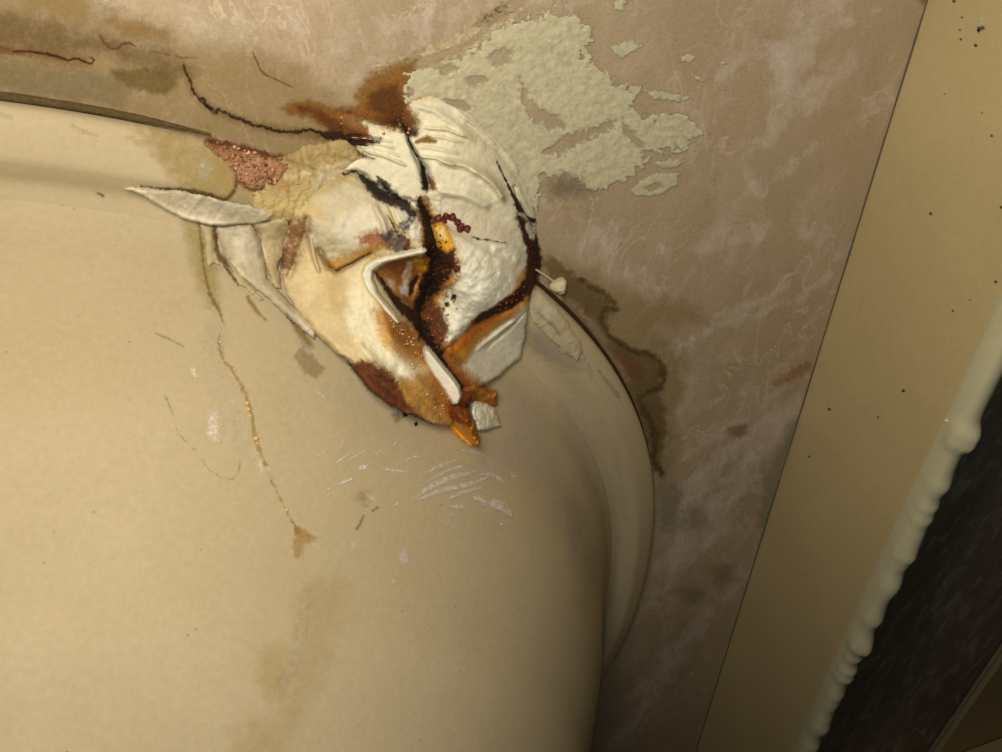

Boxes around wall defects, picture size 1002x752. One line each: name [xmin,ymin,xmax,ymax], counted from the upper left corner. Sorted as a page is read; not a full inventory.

crack [0,35,330,141]
damp [0,0,332,157]
corrosion [286,59,437,159]
peeling [611,40,643,58]
spalling [204,138,288,190]
peeling [631,158,685,197]
corrosion [279,217,309,269]
corrosion [319,215,430,307]
crack [198,223,310,521]
corrosion [348,213,542,425]
damp [544,260,678,475]